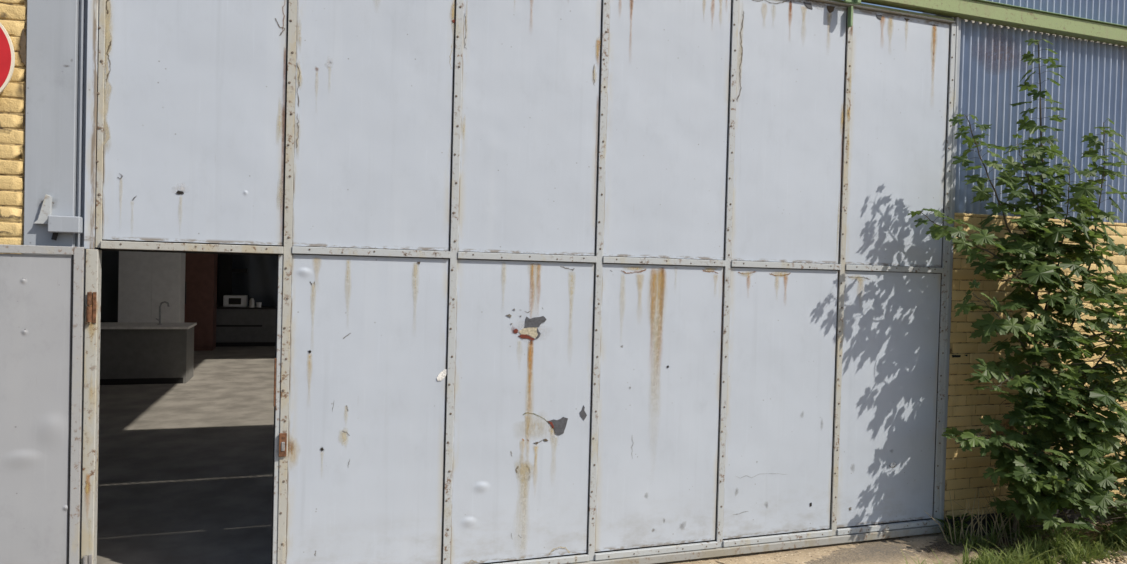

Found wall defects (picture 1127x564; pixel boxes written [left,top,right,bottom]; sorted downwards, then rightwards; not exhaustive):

corrosion [652,270,664,312]
peeling [507,308,547,341]
peeling [548,405,587,435]